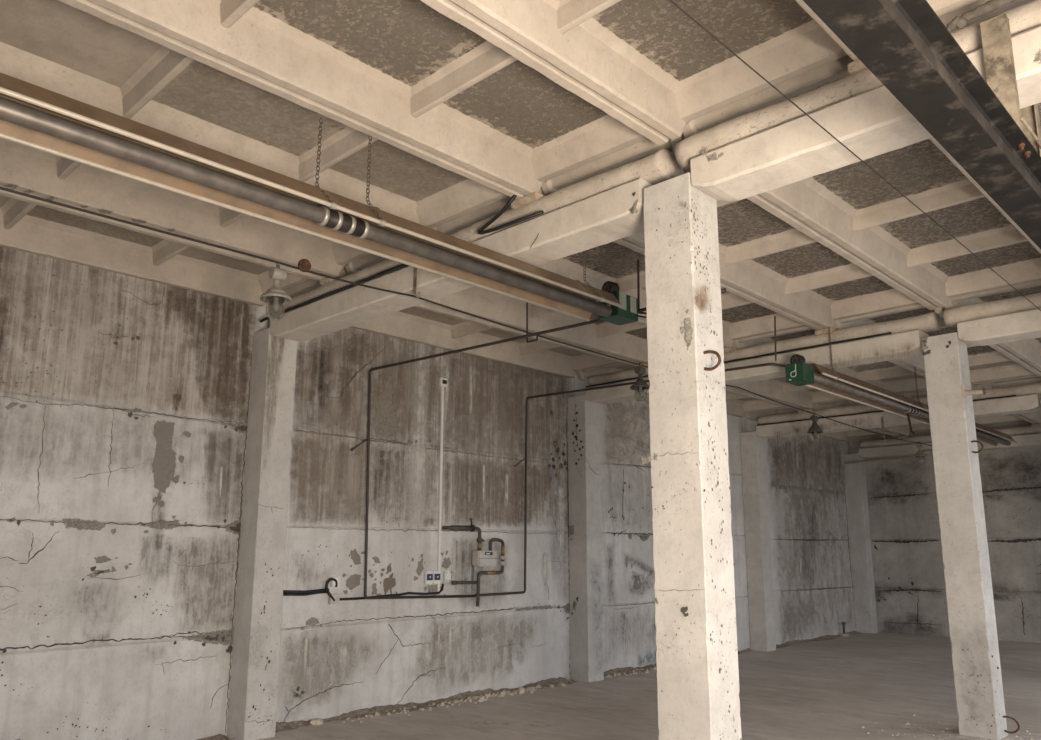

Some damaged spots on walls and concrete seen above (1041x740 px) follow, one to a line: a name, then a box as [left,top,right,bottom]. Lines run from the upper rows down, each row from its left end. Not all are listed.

leakage [0,246,249,417]
peeling [141,420,199,533]
leakage [209,435,239,515]
leakage [299,330,584,562]
crack [982,485,1041,493]
spalling [82,556,132,581]
leakage [156,541,233,625]
crack [0,342,703,733]
peeling [337,549,401,595]
peeling [408,551,452,596]
crack [987,538,1041,574]